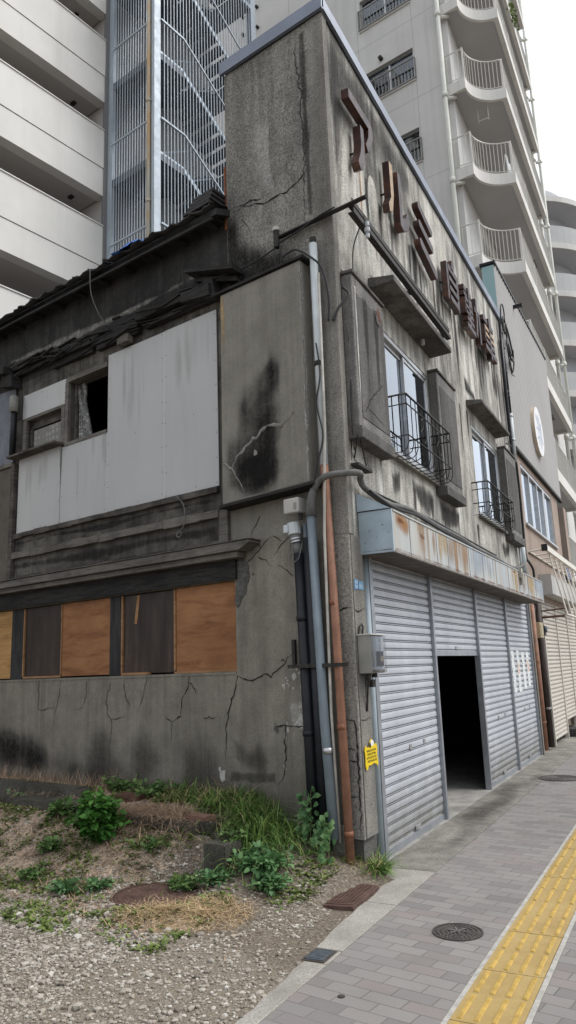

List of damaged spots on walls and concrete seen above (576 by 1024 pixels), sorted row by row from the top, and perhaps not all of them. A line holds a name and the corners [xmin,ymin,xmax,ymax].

crack [235,49,307,228]
crack [223,412,294,491]
crack [249,516,294,576]
rust [396,514,543,601]
crack [38,680,147,740]
crack [166,652,292,759]
crack [276,725,303,785]